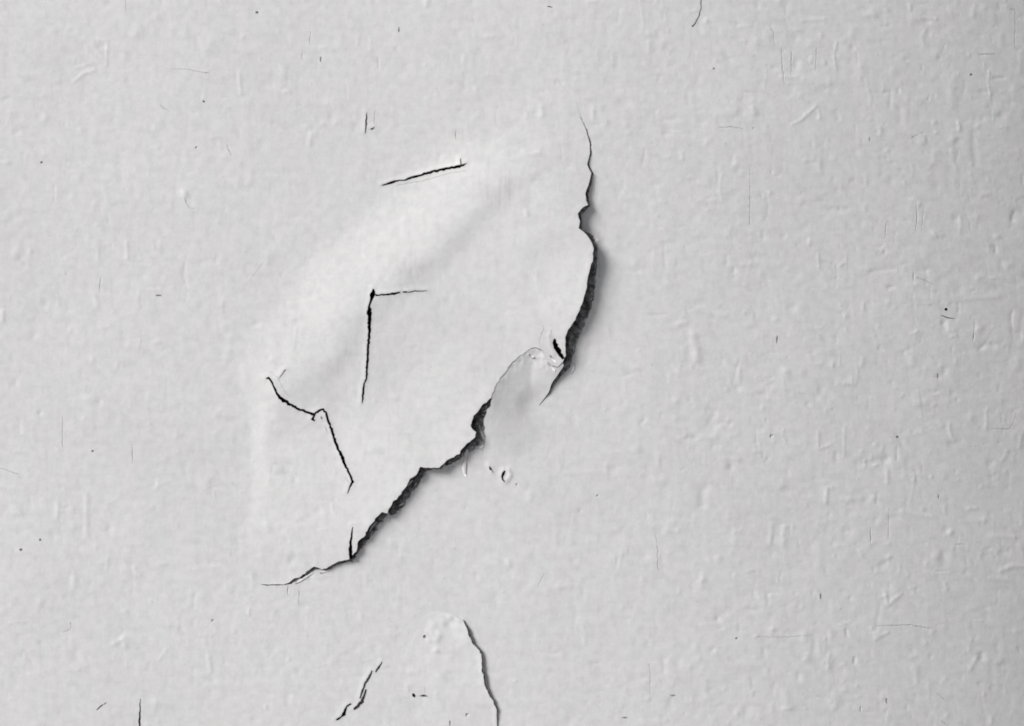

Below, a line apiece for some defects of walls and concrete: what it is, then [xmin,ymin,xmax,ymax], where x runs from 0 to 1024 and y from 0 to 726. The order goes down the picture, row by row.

crack [382,130,467,186]
crack [362,289,427,403]
crack [266,369,354,494]
spalling [475,348,564,486]
crack [336,662,382,720]